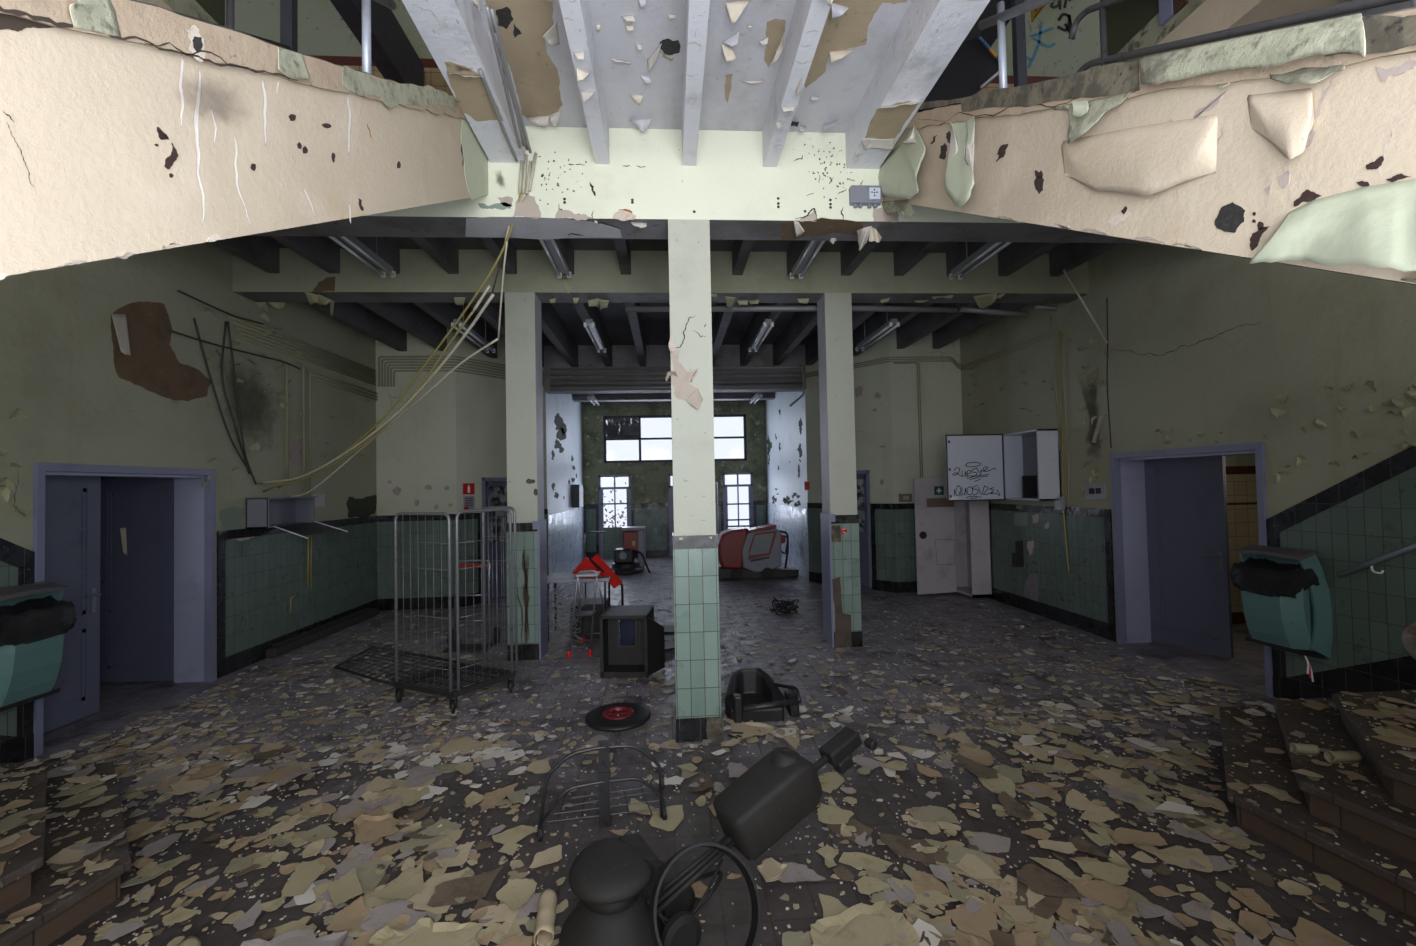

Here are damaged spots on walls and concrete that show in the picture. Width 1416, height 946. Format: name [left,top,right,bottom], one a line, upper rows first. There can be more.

crack [3,111,34,187]
crack [0,6,74,28]
crack [107,34,294,80]
peeling [473,0,563,127]
peeling [574,52,595,103]
peeling [610,0,681,132]
peeling [721,0,786,103]
peeling [774,0,1416,251]
peeling [1215,156,1416,283]
peeling [110,301,211,401]
peeling [666,336,703,410]